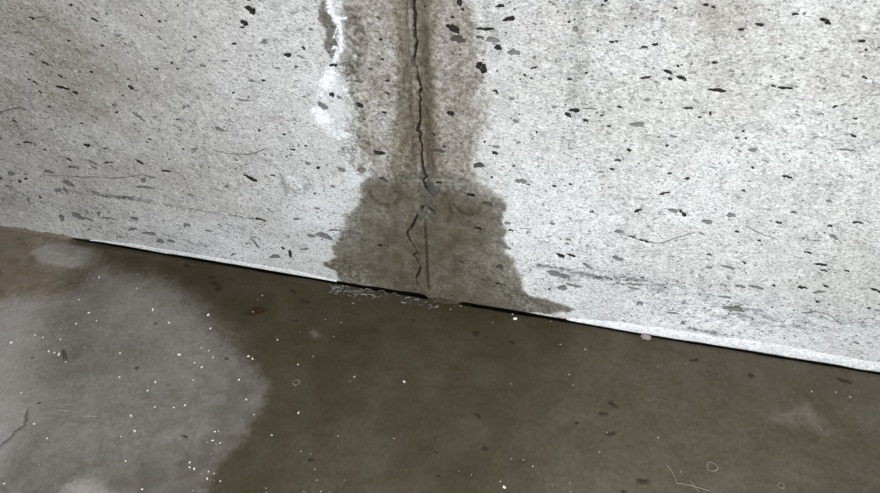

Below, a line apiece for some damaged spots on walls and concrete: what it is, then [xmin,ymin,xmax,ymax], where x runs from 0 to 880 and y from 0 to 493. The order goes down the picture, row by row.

leakage [309,0,362,187]
crack [411,0,428,189]
crack [406,214,421,278]
leakage [73,174,880,493]